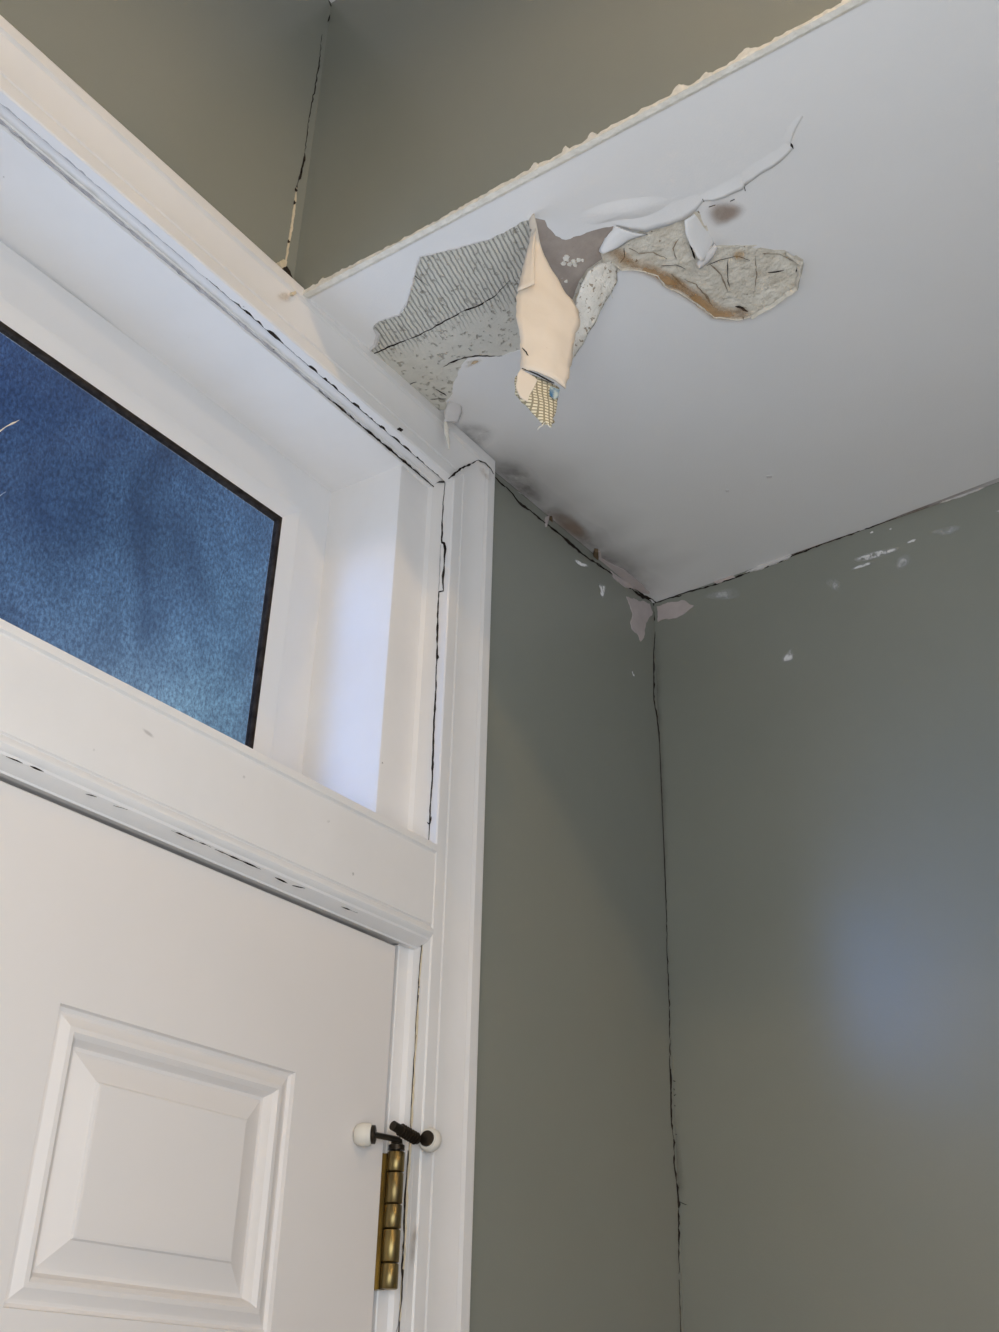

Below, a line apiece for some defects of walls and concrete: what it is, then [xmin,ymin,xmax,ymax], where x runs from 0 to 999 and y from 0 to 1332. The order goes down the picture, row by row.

crack [285,1,332,261]
peeling [302,0,870,450]
crack [0,104,656,840]
peeling [593,485,988,641]
crack [653,637,686,1332]